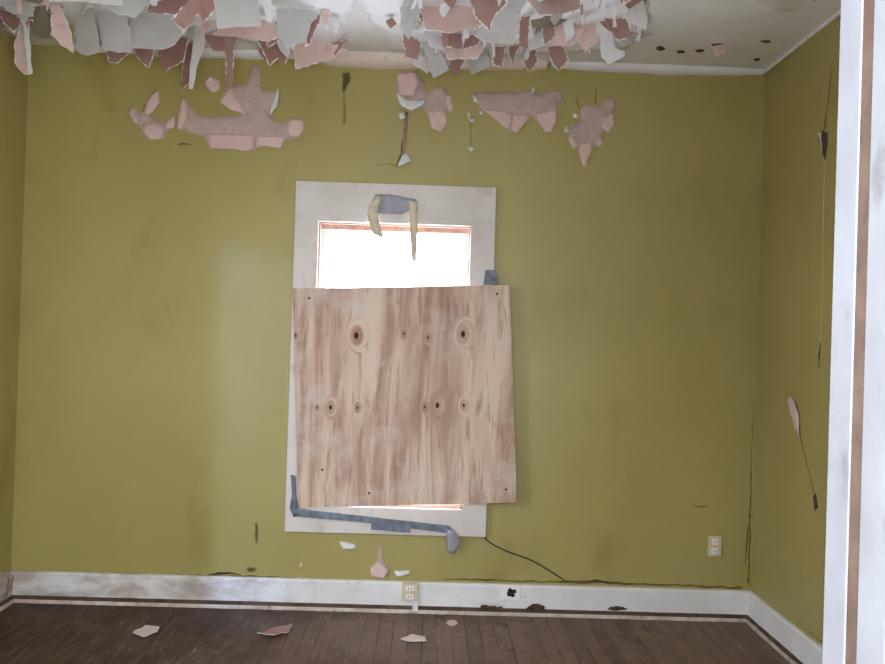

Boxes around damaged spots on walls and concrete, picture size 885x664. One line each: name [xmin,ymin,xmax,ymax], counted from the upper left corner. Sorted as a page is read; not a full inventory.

peeling [0,0,653,167]
spalling [677,43,726,57]
crack [817,69,832,364]
peeling [370,546,410,578]